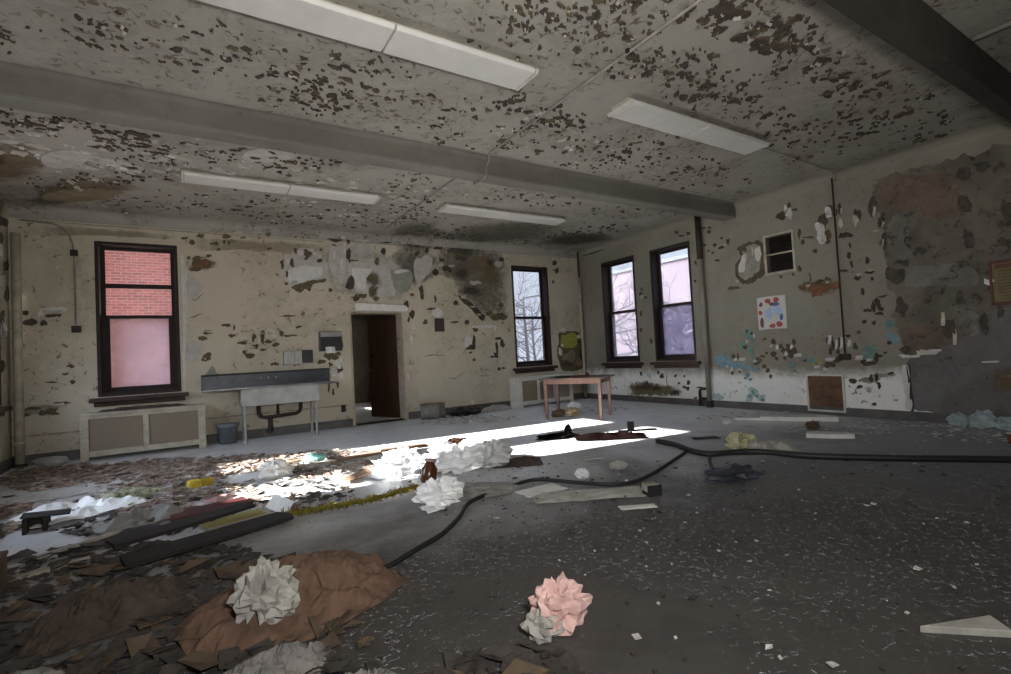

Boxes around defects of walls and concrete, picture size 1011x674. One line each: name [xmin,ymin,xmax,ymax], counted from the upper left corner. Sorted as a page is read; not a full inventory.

peeling [0,26,16,55]
peeling [61,10,436,117]
peeling [478,0,954,160]
damp [0,145,40,178]
peeling [417,88,730,190]
spalling [0,108,677,338]
damp [334,223,610,321]
peeling [701,227,765,290]
spalling [714,144,1011,417]
spalling [451,320,507,371]